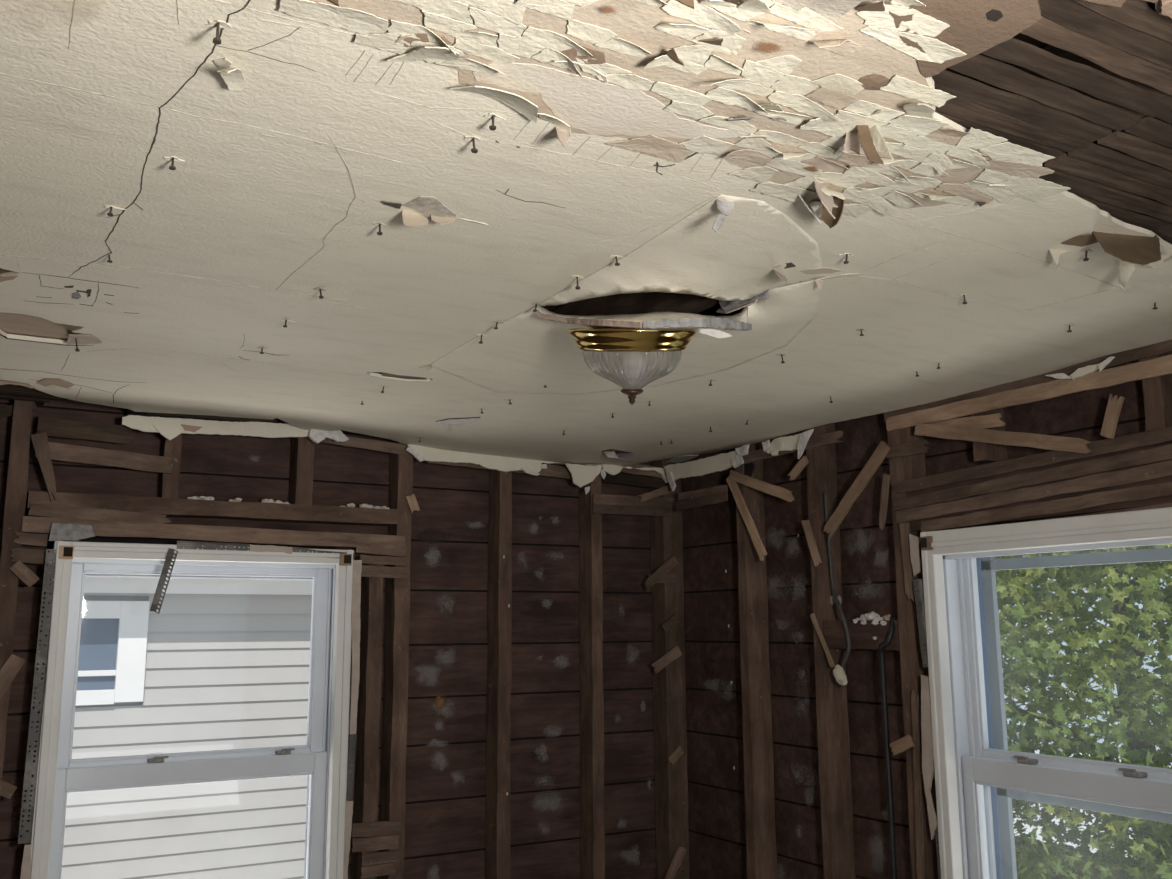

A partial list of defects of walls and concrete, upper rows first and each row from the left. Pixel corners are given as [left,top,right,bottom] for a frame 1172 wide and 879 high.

flaking render [1144,0,1172,19]
peeling [278,0,1071,229]
crack [0,0,723,364]
peeling [0,268,19,282]
spalling [64,285,91,299]
peeling [1049,231,1172,290]
peeling [0,312,102,346]